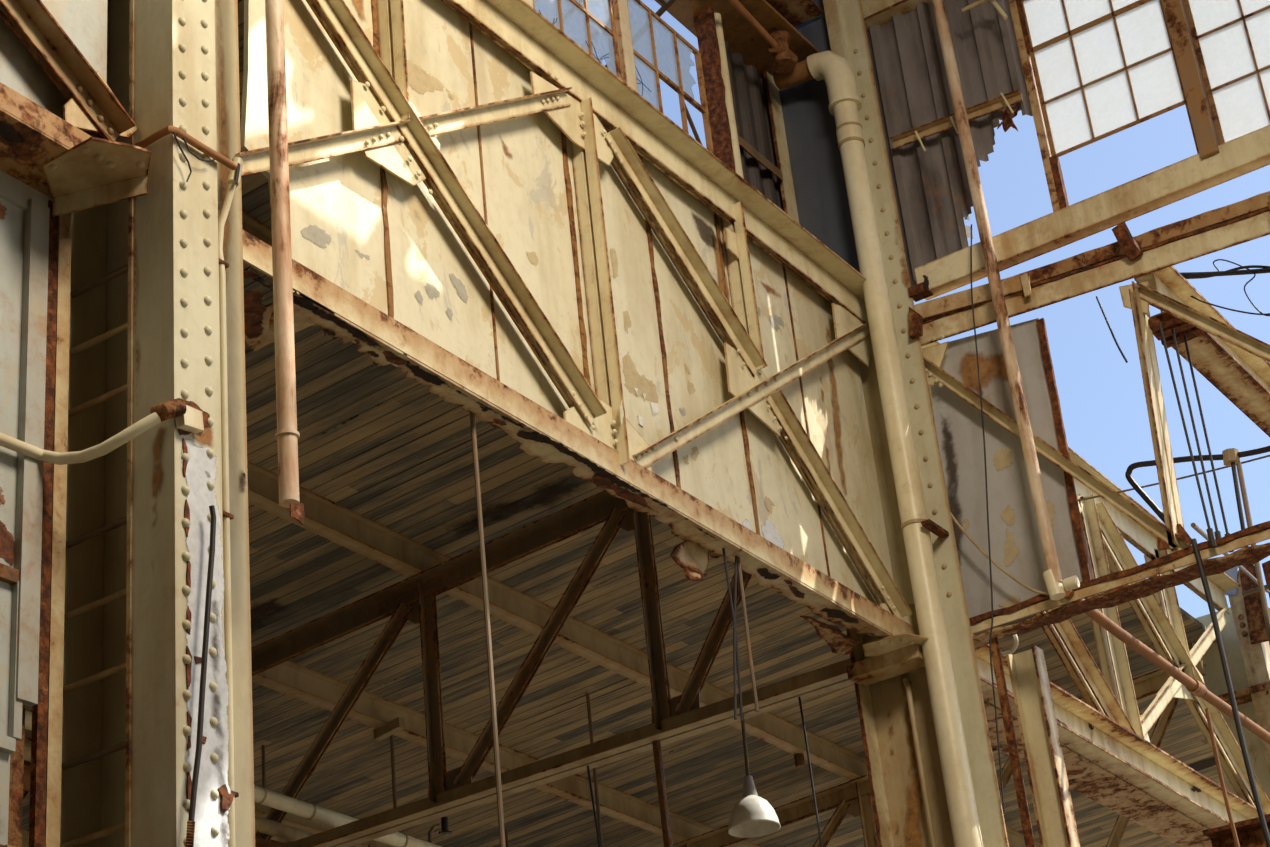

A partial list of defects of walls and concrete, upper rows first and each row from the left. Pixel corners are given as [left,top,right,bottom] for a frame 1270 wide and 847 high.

corrosion [0,121,41,156]
corrosion [901,259,929,288]
peeling [624,311,632,333]
peeling [619,354,658,427]
peeling [181,438,231,847]